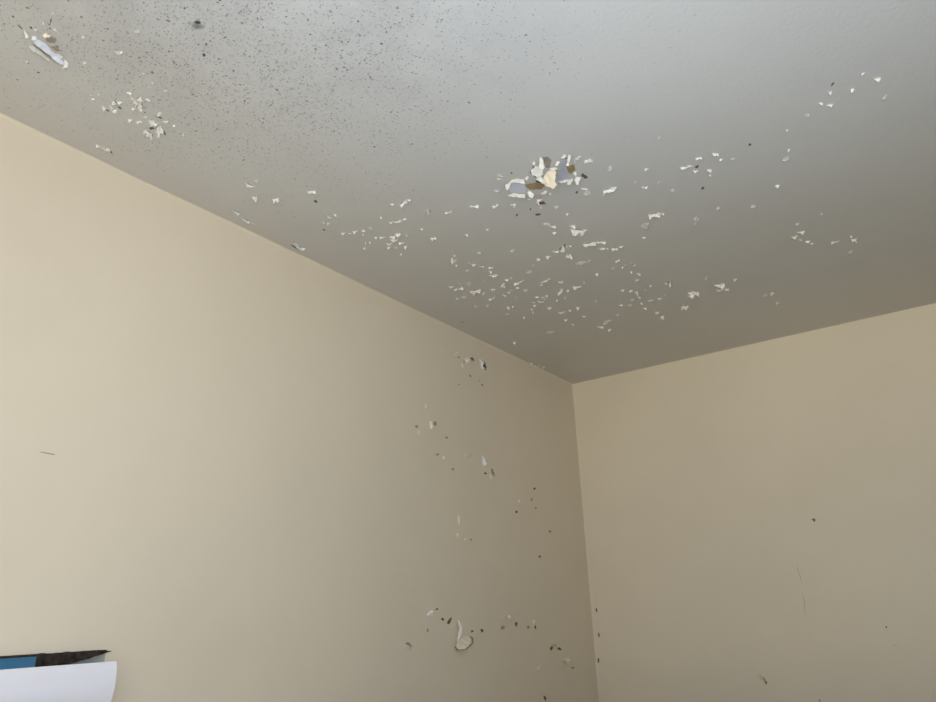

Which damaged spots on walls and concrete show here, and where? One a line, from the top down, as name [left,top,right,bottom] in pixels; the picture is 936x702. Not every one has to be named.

peeling [12,12,86,73]
peeling [90,73,184,145]
peeling [341,217,409,255]
peeling [448,154,672,335]
peeling [427,608,483,650]